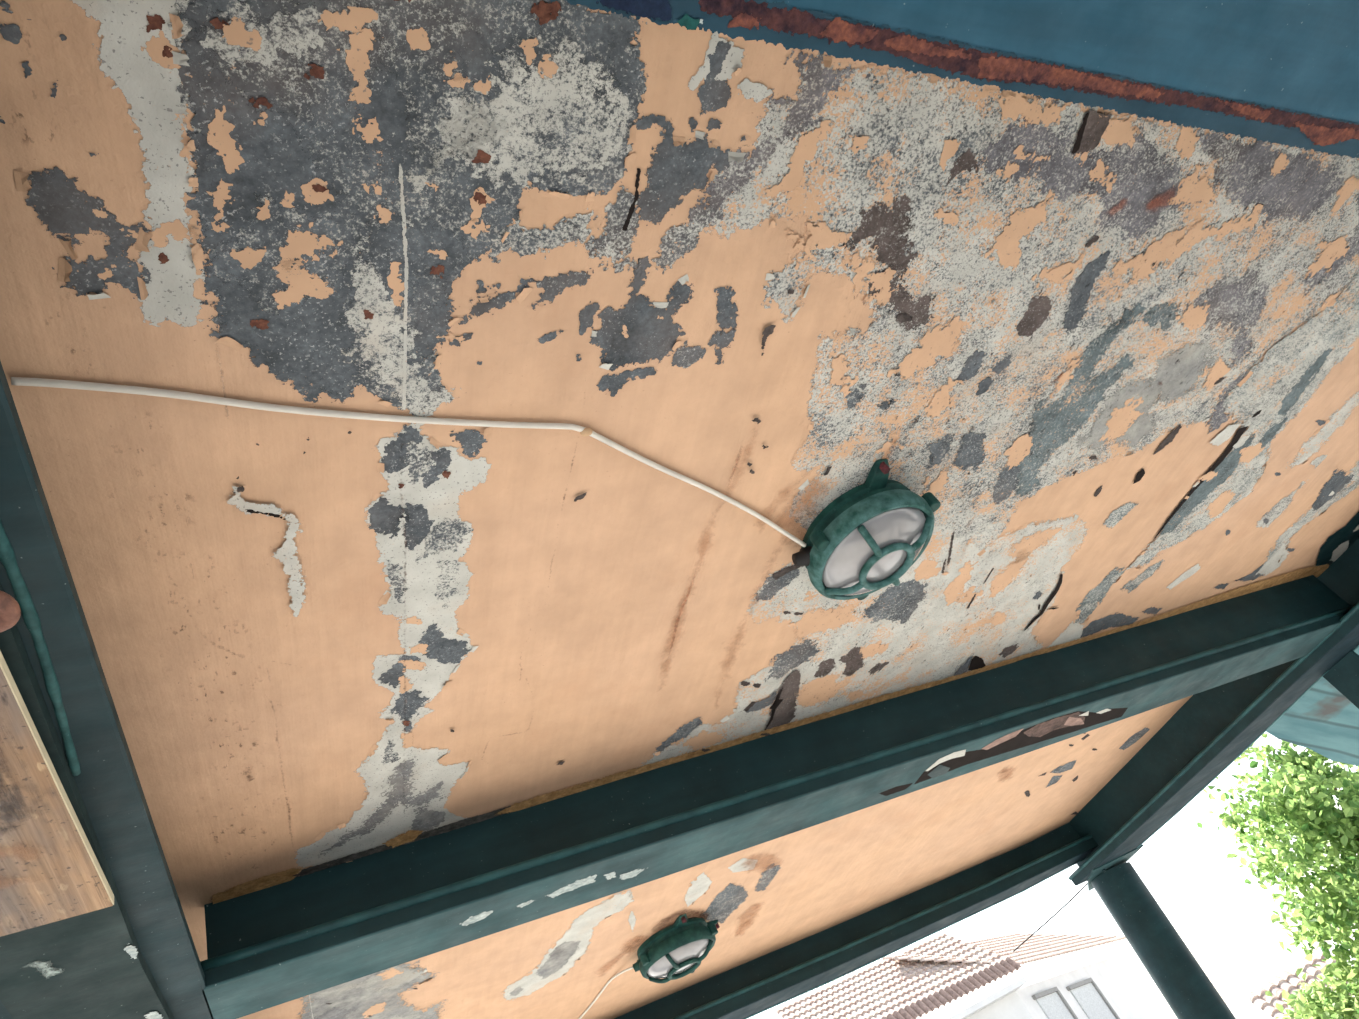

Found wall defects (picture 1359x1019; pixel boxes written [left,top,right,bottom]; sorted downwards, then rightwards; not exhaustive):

peeling [0,1,31,44]
rust [550,0,1359,158]
peeling [13,0,1359,768]
peeling [294,423,492,868]
peeling [1039,733,1097,788]
spalling [459,910,493,926]
peeling [501,869,644,1001]
peeling [685,858,781,923]
peeling [297,960,446,1019]